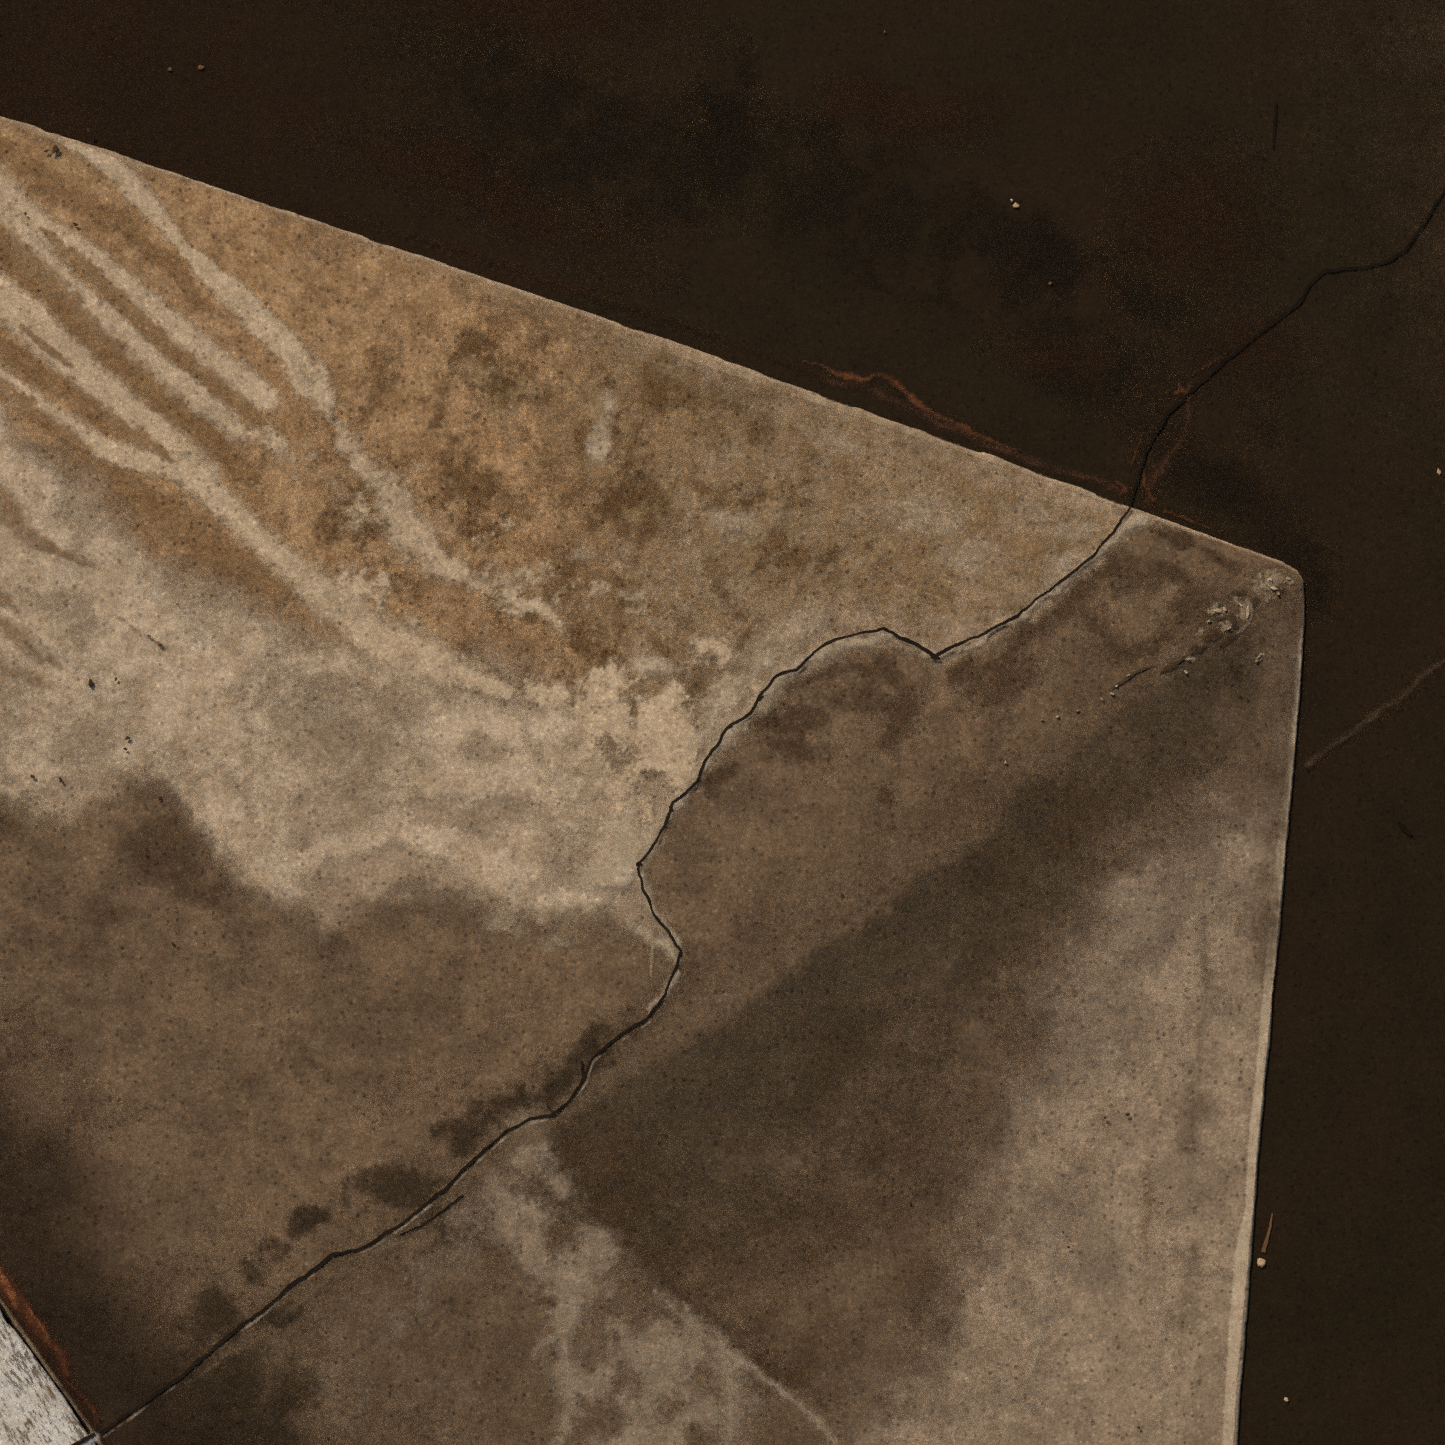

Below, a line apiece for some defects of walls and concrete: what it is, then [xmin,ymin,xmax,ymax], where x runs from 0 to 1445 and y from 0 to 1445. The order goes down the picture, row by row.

corrosion [802,361,1126,491]
leakage [751,570,814,671]
leakage [700,673,761,734]
leakage [1103,861,1178,960]
crack [71,506,1148,1445]
corrosion [0,1268,100,1427]
leakage [643,1388,693,1428]